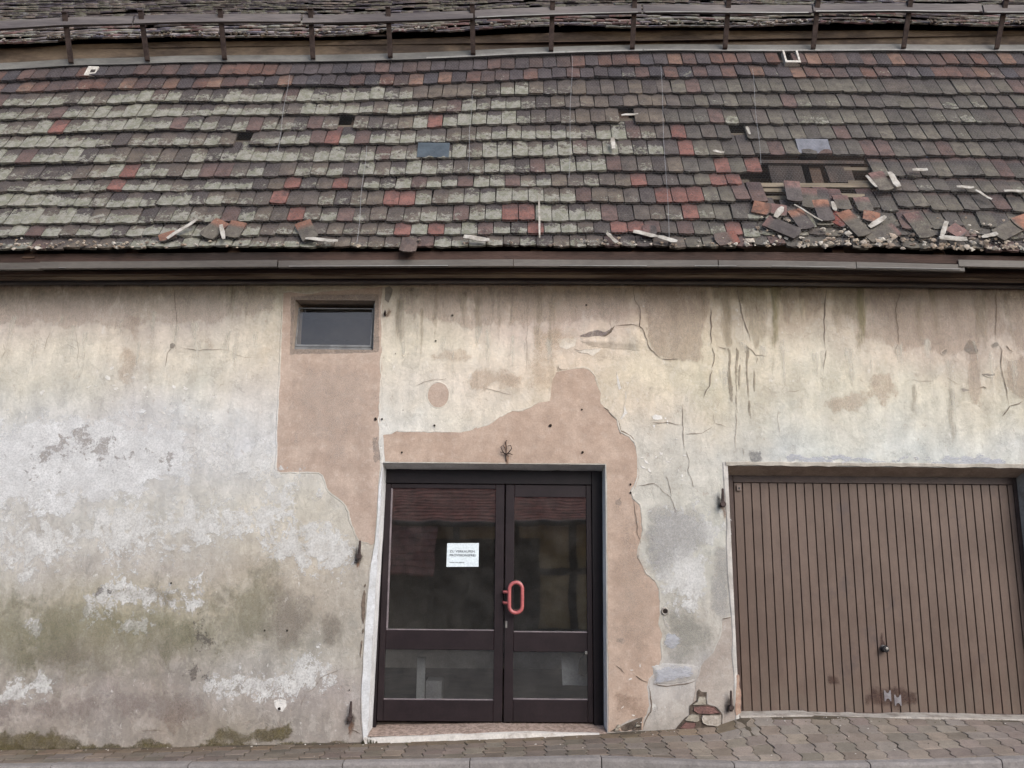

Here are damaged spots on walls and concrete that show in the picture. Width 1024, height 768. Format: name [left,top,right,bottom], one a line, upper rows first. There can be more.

crack [616,288,672,360]
crack [917,288,1021,415]
crack [634,288,763,565]
peeling [0,286,731,732]
peeling [676,617,741,729]